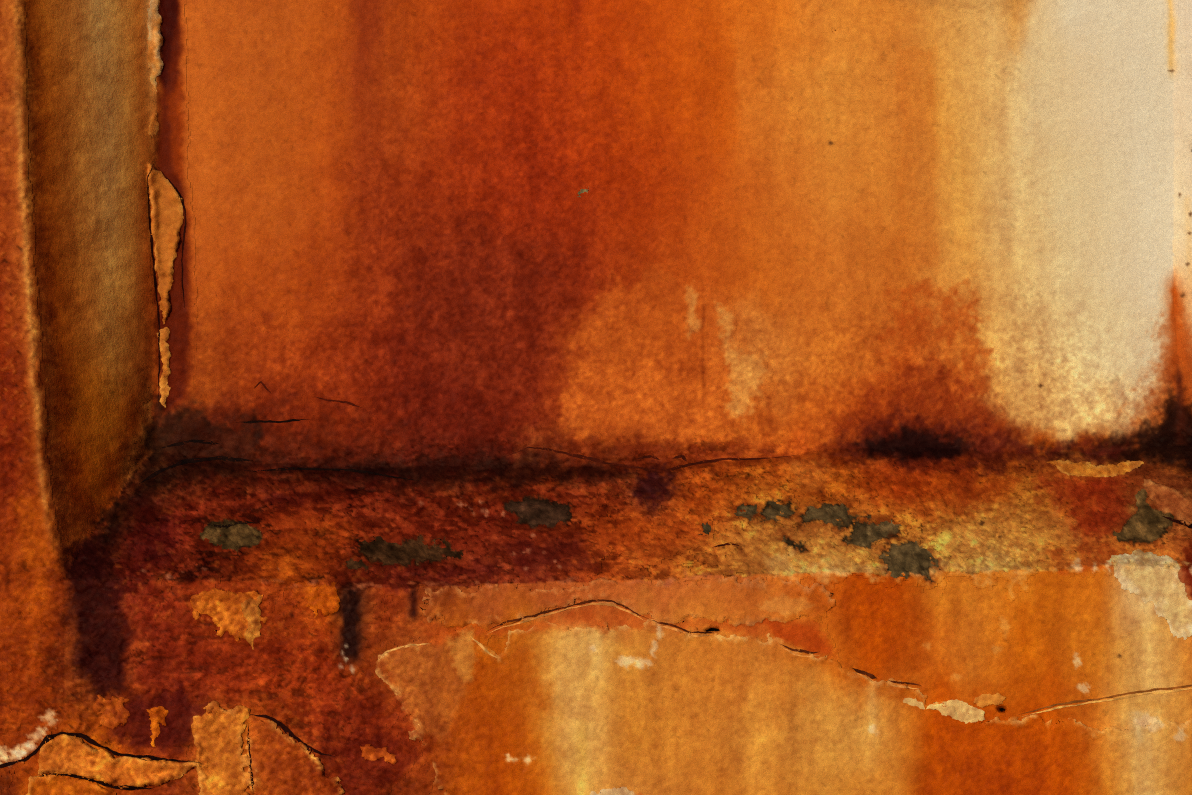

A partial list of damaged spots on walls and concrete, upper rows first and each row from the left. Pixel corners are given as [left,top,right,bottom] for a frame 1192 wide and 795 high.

peeling [147,0,164,91]
rust [0,127,60,604]
peeling [148,164,184,408]
crack [139,396,419,484]
rust [150,0,721,446]
rust [52,267,1145,795]
crack [504,447,795,473]
peeling [189,460,1192,795]
water stain [827,398,1138,484]
rust [1105,264,1192,491]
rust [1177,537,1192,600]
peeling [0,701,344,795]